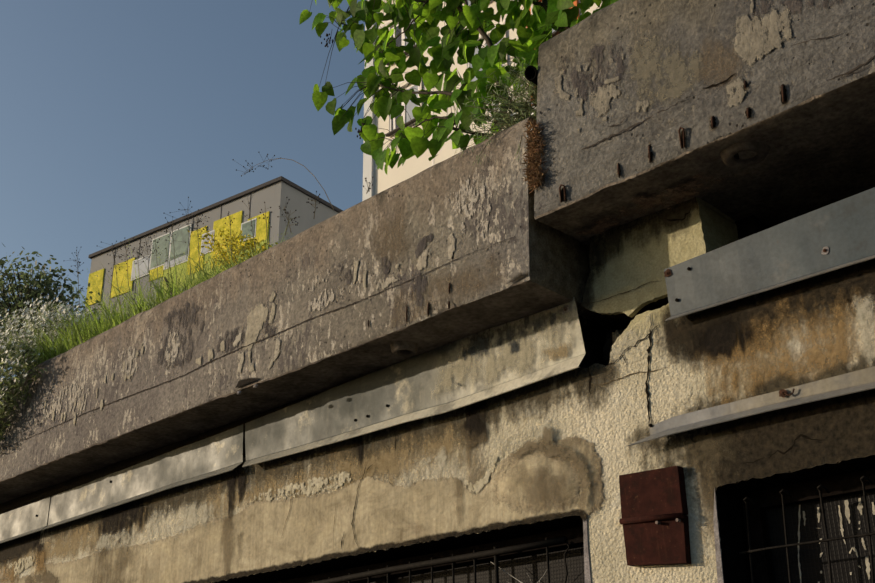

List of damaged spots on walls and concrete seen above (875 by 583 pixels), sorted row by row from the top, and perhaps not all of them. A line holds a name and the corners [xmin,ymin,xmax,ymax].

peeling [734,0,793,67]
peeling [555,63,620,121]
peeling [446,175,494,259]
peeling [41,343,143,426]
peeling [195,291,280,395]
leakage [434,311,571,393]
crack [588,315,670,427]
corrosion [707,298,859,404]
efflorescence [857,299,875,364]
leakage [0,418,478,583]
crack [333,460,374,548]
leakage [501,420,600,509]